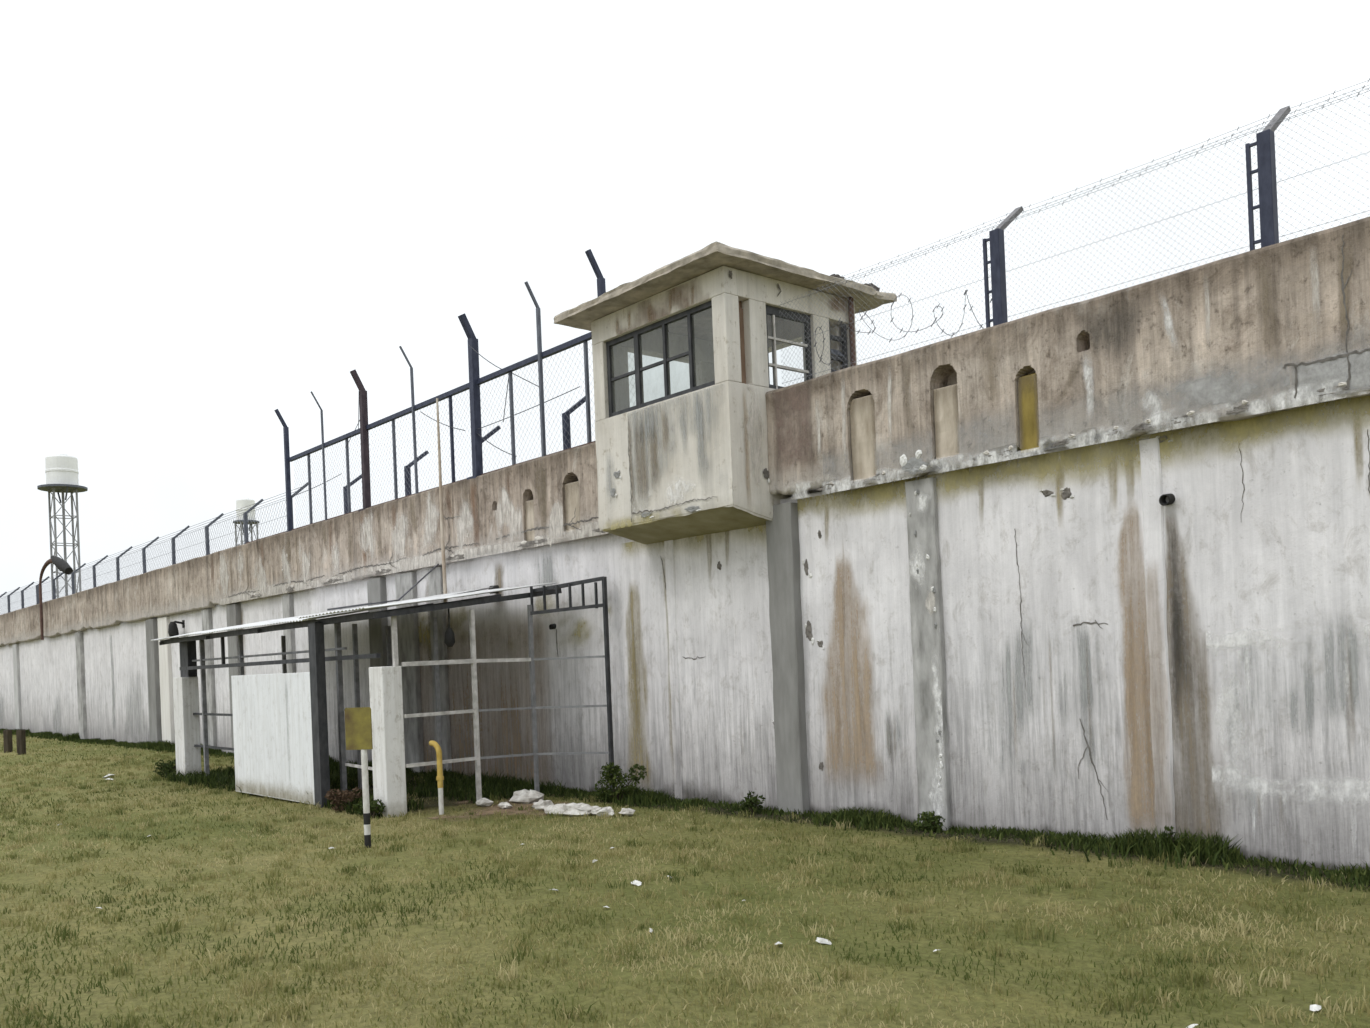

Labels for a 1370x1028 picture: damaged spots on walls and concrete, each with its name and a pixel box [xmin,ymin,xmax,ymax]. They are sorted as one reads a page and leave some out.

damp [1339,257,1348,325]
damp [1147,395,1217,432]
damp [1249,383,1341,414]
damp [931,442,1043,472]
damp [1069,429,1119,448]
damp [786,470,909,499]
crack [1073,620,1108,629]
damp [1120,520,1155,824]
damp [1166,525,1284,839]
damp [1290,627,1370,727]
crack [1078,718,1107,818]
damp [1300,779,1370,801]